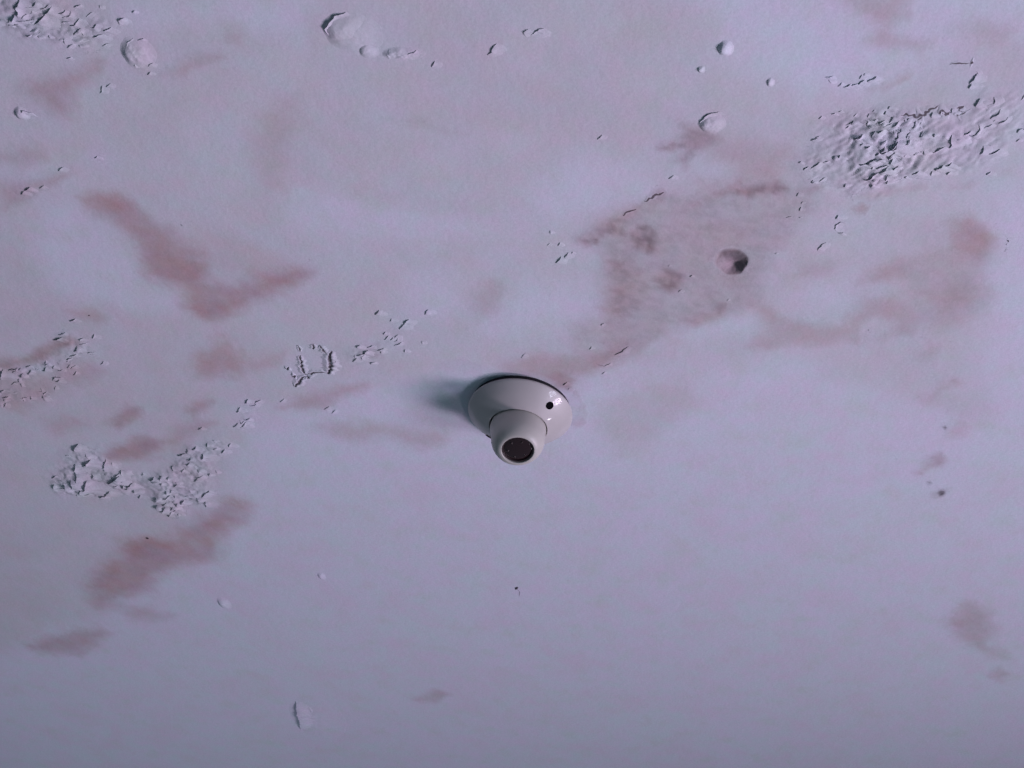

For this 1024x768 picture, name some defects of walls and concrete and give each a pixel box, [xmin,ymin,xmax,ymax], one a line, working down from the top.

peeling [0,0,140,61]
peeling [797,70,1024,205]
hole [707,243,755,280]
damp [553,114,1018,353]
peeling [0,318,109,408]
peeling [339,320,415,380]
peeling [38,398,269,519]